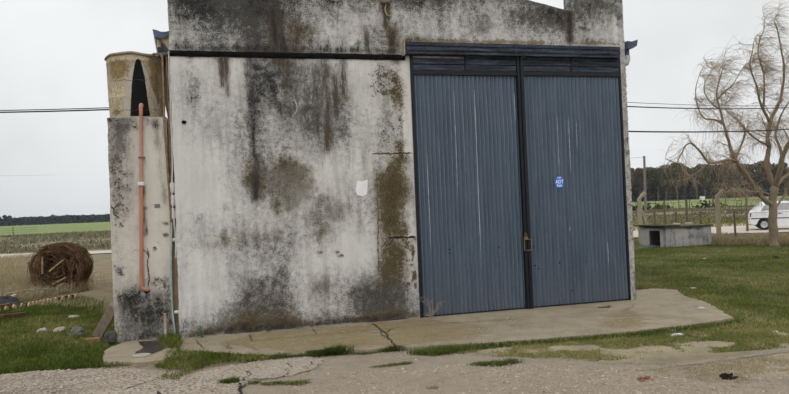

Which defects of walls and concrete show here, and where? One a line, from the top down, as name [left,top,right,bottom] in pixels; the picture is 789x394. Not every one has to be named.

leakage [379,2,399,54]
leakage [550,8,619,45]
leakage [175,0,371,215]
leakage [114,277,173,354]
leakage [190,263,419,336]